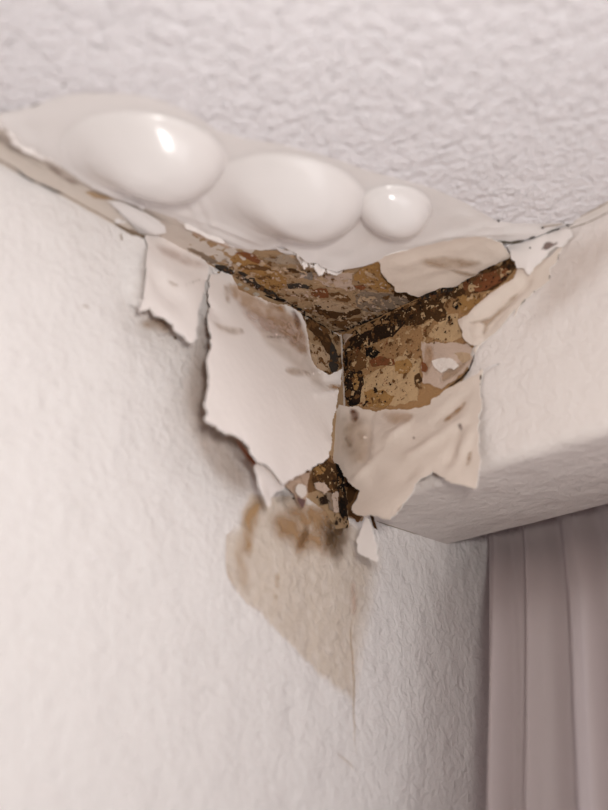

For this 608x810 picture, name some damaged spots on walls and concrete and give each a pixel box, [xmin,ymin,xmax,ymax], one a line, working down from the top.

peeling [0,92,573,562]
leakage [187,248,515,407]
leakage [246,504,260,529]
leakage [277,459,358,550]